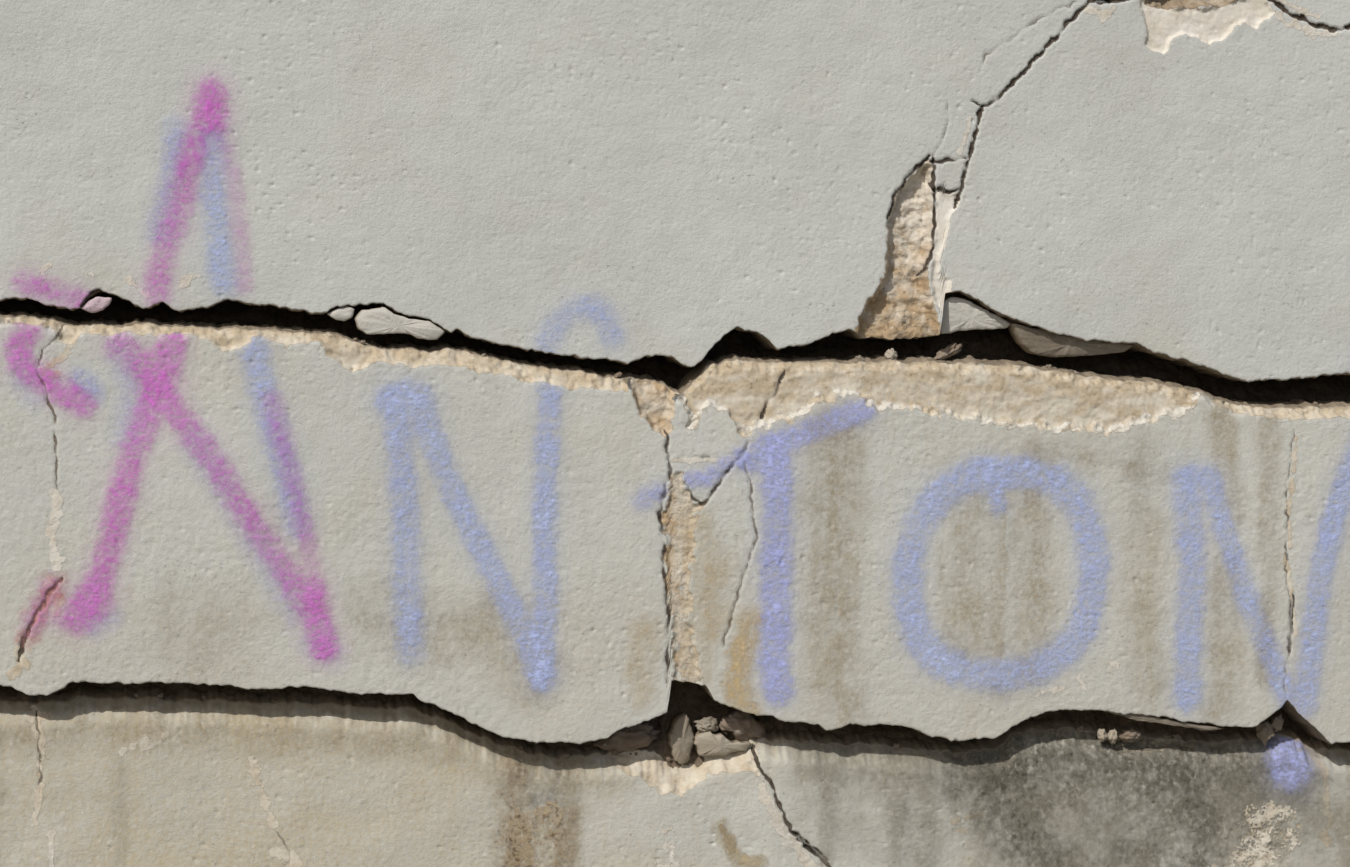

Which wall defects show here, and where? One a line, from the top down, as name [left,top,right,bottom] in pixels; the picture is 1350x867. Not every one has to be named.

flaking render [1139,0,1275,55]
crack [1268,0,1350,40]
crack [887,0,1129,276]
flaking render [4,160,1350,438]
crack [0,289,1350,867]
flaking render [657,471,704,683]
flaking render [604,738,760,799]
damp [719,824,762,867]
damp [949,729,1299,867]